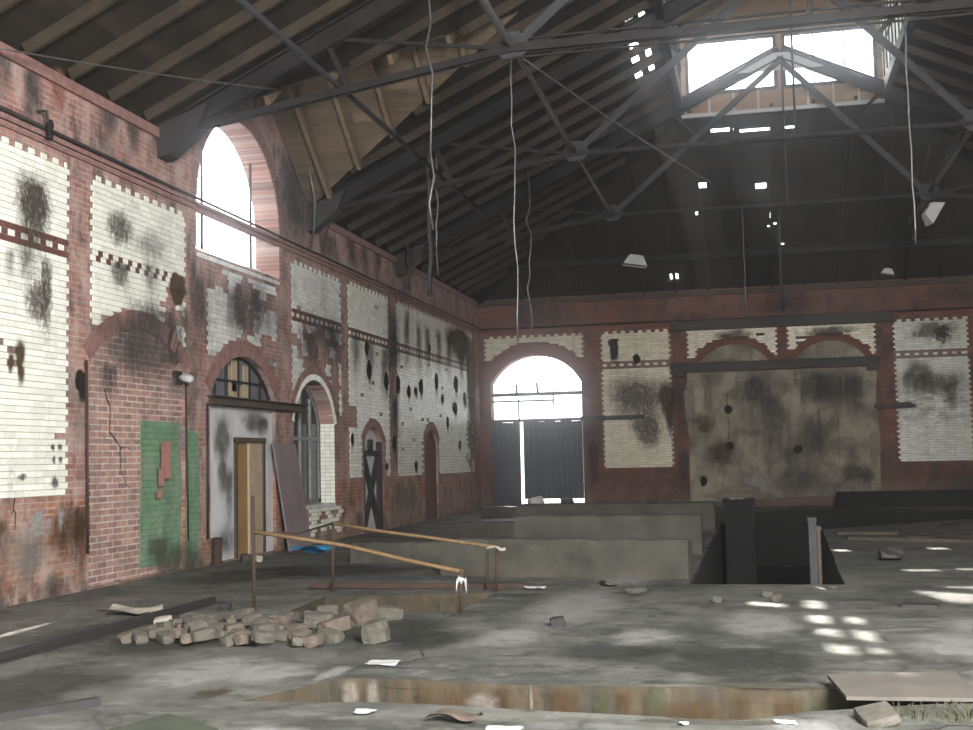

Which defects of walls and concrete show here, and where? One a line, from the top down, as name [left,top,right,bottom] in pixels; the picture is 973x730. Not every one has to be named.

water stain [42,262,52,312]
spalling [8,341,25,382]
water stain [904,362,960,399]
water stain [659,383,673,430]
peeling [157,441,172,499]
water stain [216,421,232,500]